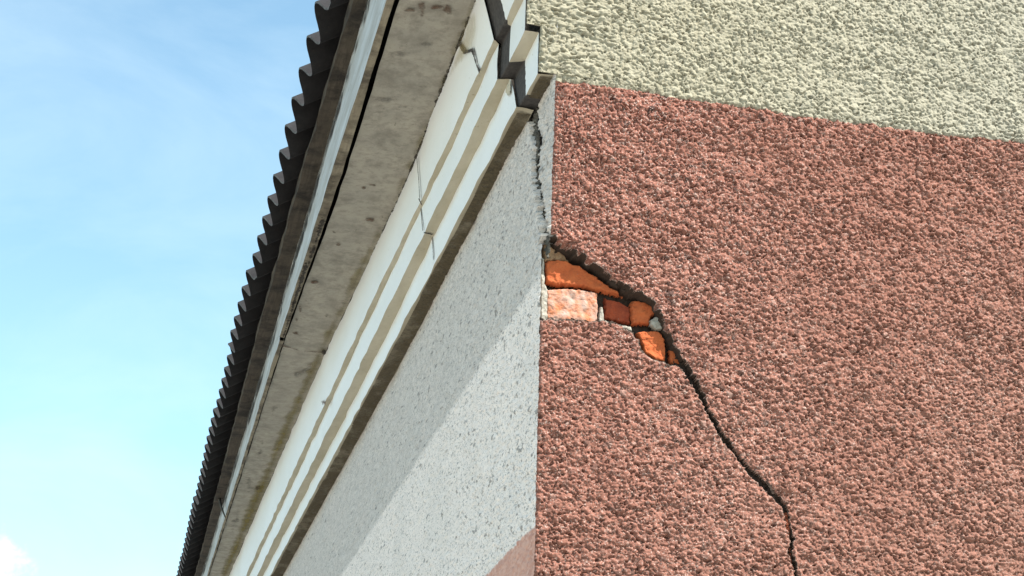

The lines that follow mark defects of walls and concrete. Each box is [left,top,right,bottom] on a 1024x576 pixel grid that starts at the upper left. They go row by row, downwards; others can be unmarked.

spalling [539,243,679,368]
crack [673,357,795,575]